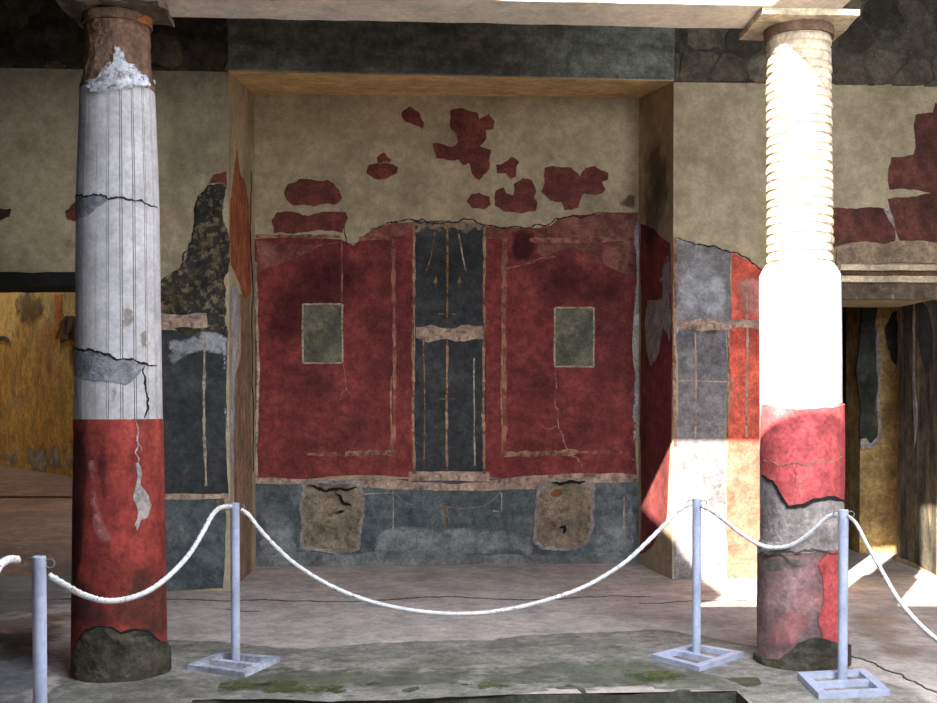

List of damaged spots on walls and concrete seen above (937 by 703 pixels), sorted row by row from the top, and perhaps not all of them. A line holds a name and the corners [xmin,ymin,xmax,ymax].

crack [75,193,157,208]
crack [173,183,226,277]
peeling [835,240,937,267]
crack [247,171,255,471]
crack [73,347,157,462]
spalling [133,463,152,530]
spalling [71,625,172,683]